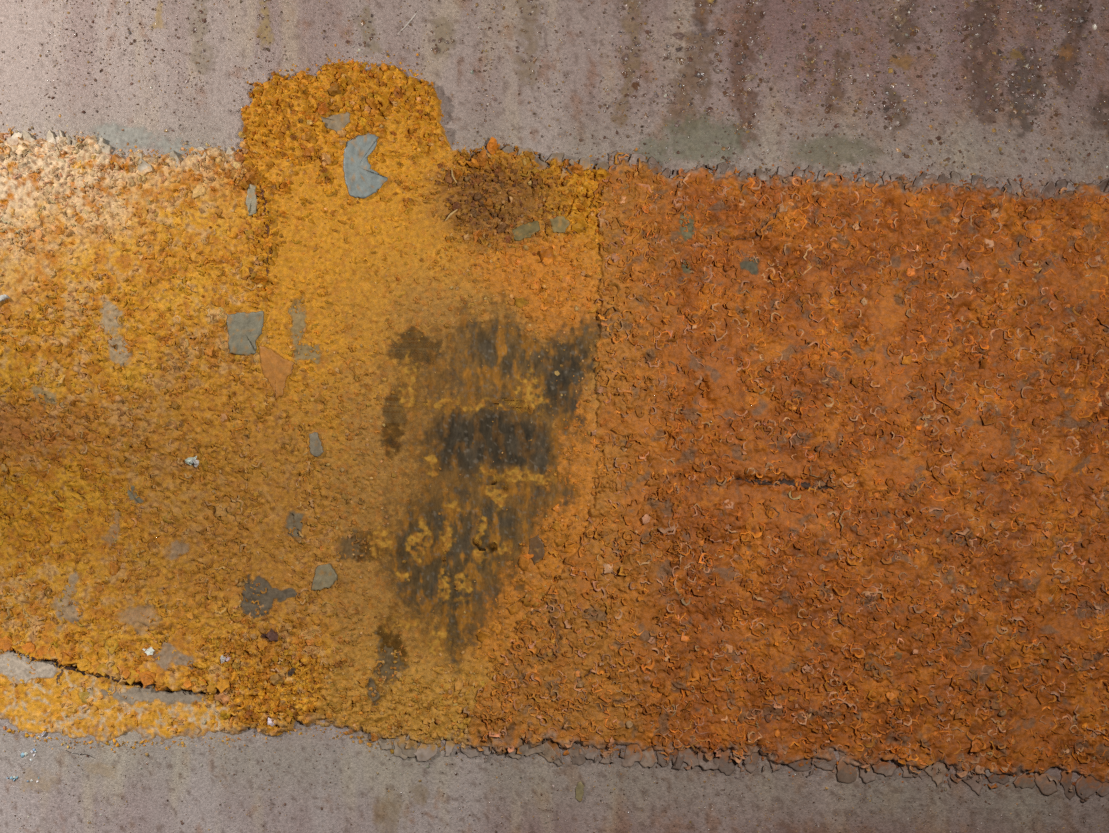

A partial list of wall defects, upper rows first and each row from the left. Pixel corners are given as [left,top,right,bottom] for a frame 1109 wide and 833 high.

rust [606,0,650,120]
rust [868,83,914,127]
peeling [321,112,388,198]
peeling [226,311,264,356]
peeling [289,300,320,364]
peeling [286,512,303,537]
peeling [309,293,602,705]
peeling [240,575,299,618]